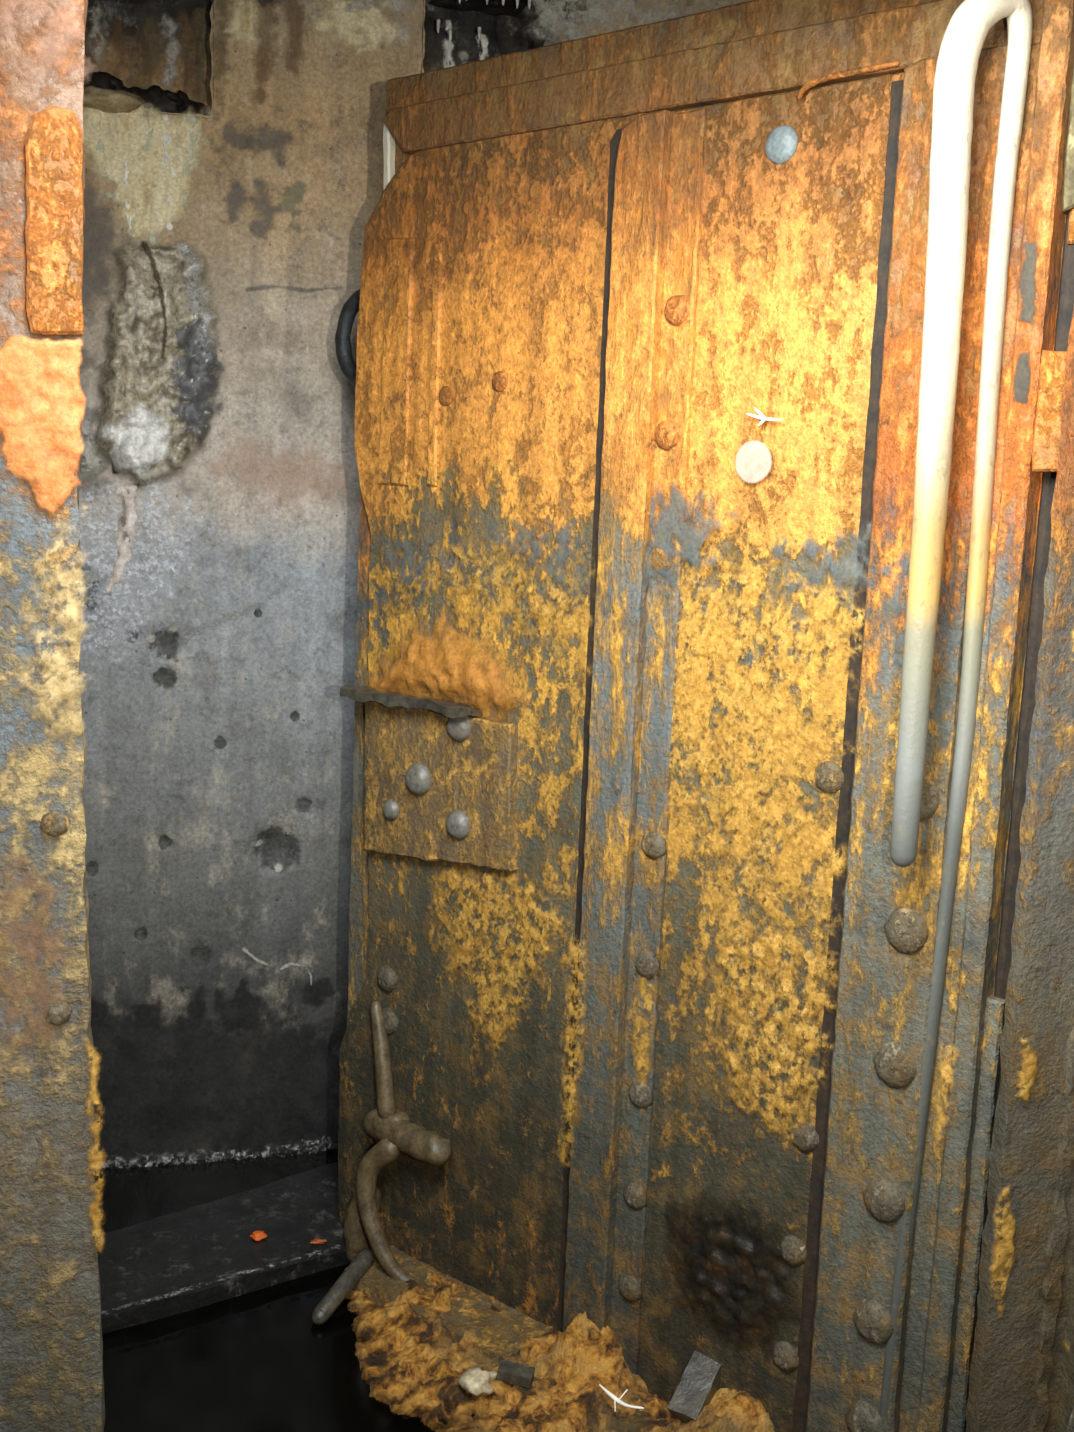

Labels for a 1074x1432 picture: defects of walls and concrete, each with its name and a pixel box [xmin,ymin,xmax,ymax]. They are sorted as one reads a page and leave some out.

damp [314,0,409,52]
damp [82,0,290,304]
rust [1019,243,1037,323]
rust [0,336,86,514]
rust [1014,353,1030,403]
damp [242,948,335,1006]
damp [91,984,343,1170]
rust [667,1201,799,1346]